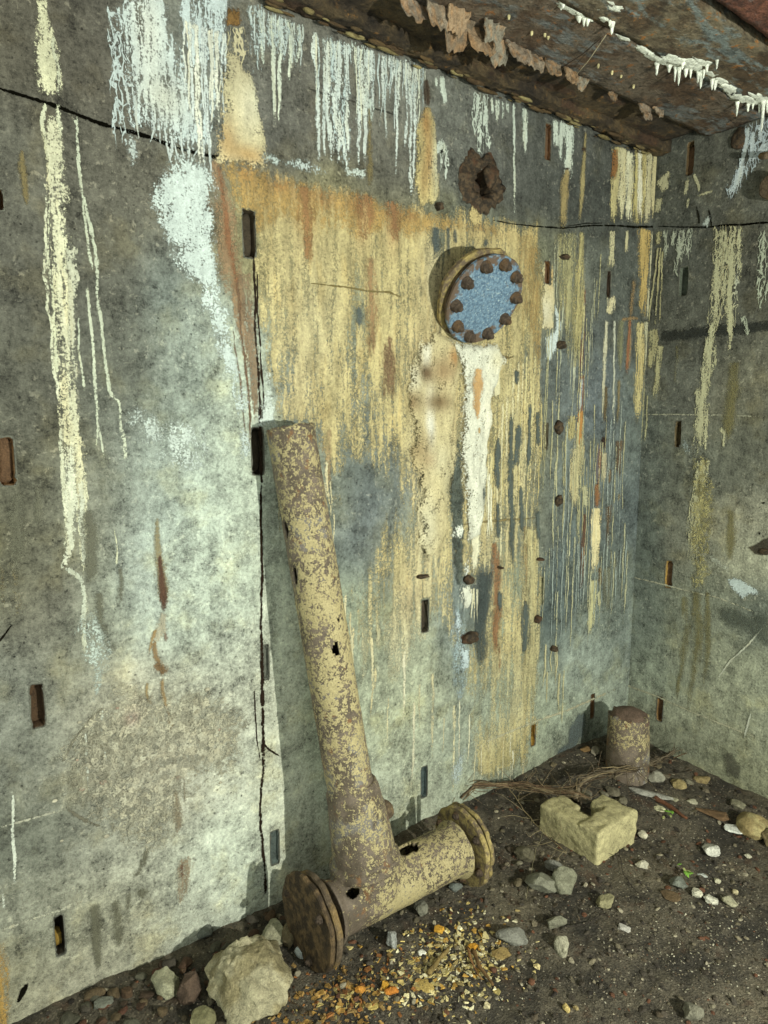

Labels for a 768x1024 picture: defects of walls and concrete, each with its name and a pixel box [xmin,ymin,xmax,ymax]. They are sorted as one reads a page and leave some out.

crack [0,88,219,159]
corrosion [415,80,506,216]
corrosion [400,0,589,92]
corrosion [560,133,587,226]
crack [493,207,768,229]
corrosion [638,103,664,121]
damp [34,0,209,695]
corrosion [212,161,258,444]
damp [107,0,768,793]
corrosion [604,281,638,420]
corrosion [595,437,623,546]
crack [253,259,279,894]